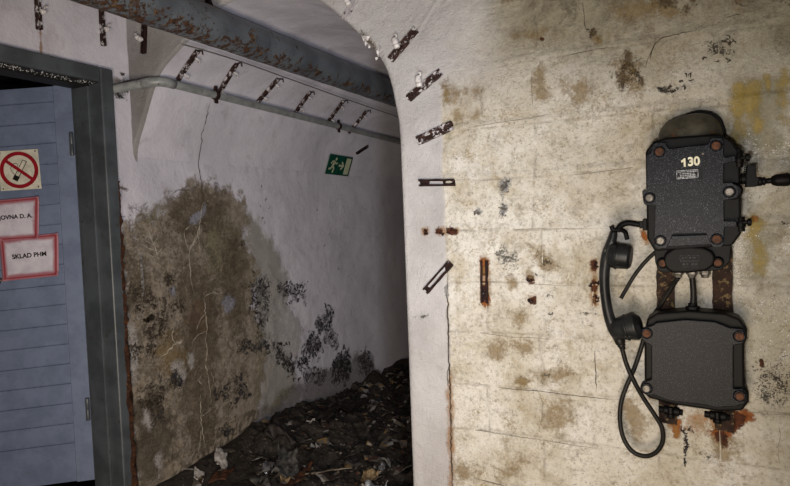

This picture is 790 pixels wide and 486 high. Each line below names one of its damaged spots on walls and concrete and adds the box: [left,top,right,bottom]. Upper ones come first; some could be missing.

crack [645,30,696,68]
damp [702,34,736,63]
damp [611,50,644,91]
crack [198,104,210,204]
corrosion [422,227,459,236]
corrosion [118,181,139,486]
damp [122,178,267,486]
corrosion [668,419,682,438]
corrosion [707,409,756,448]